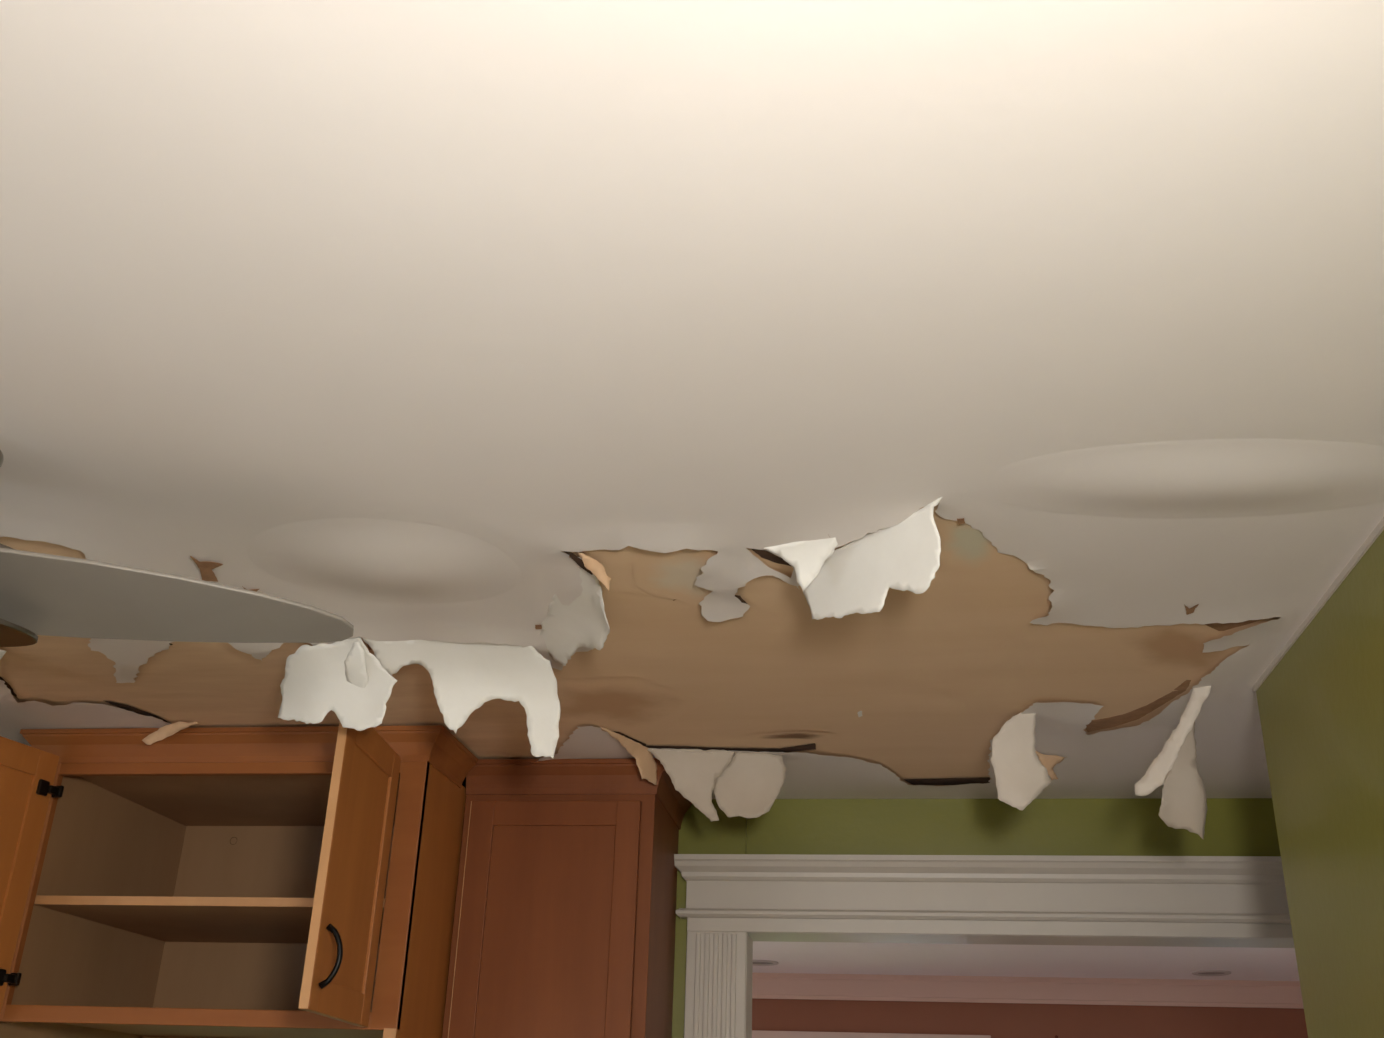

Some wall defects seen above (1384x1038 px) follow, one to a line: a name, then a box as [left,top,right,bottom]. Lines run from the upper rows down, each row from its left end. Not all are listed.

peeling [0,497,1212,840]
peeling [1220,617,1281,647]